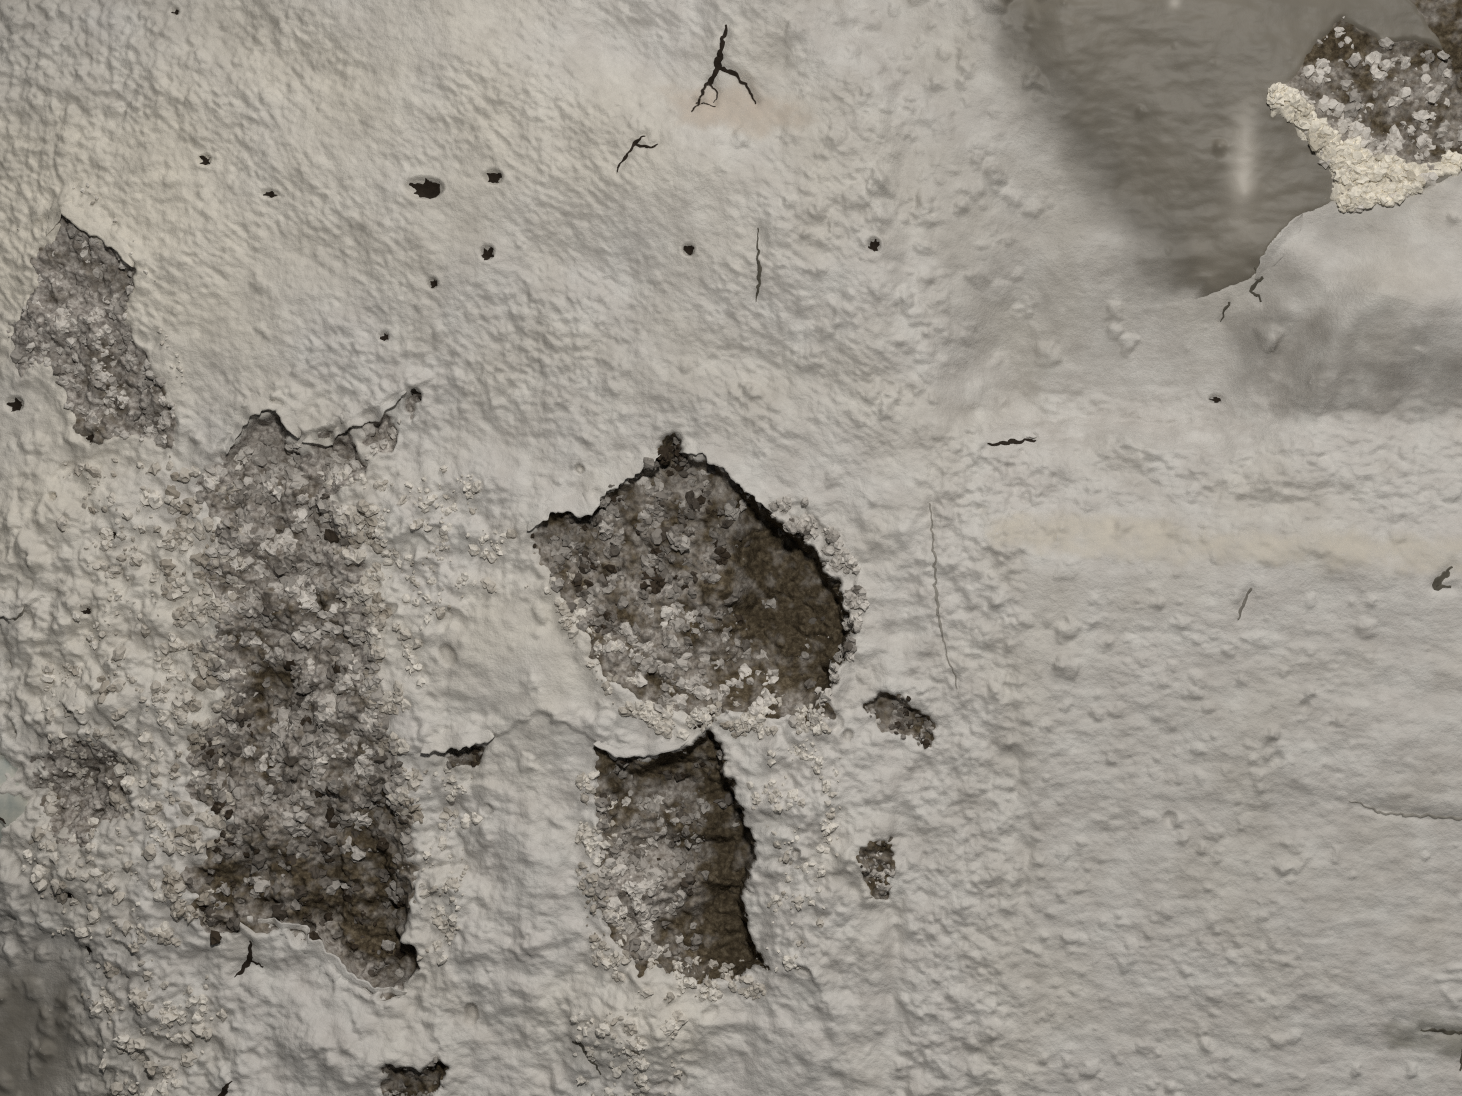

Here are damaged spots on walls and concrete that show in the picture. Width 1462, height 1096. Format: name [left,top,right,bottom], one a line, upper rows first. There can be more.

crack [691,24,756,112]
peeling [999,0,1462,297]
flaking render [6,201,177,449]
flaking render [29,739,132,847]
flaking render [157,391,495,1001]
flaking render [527,433,869,1003]
flaking render [379,1056,449,1096]